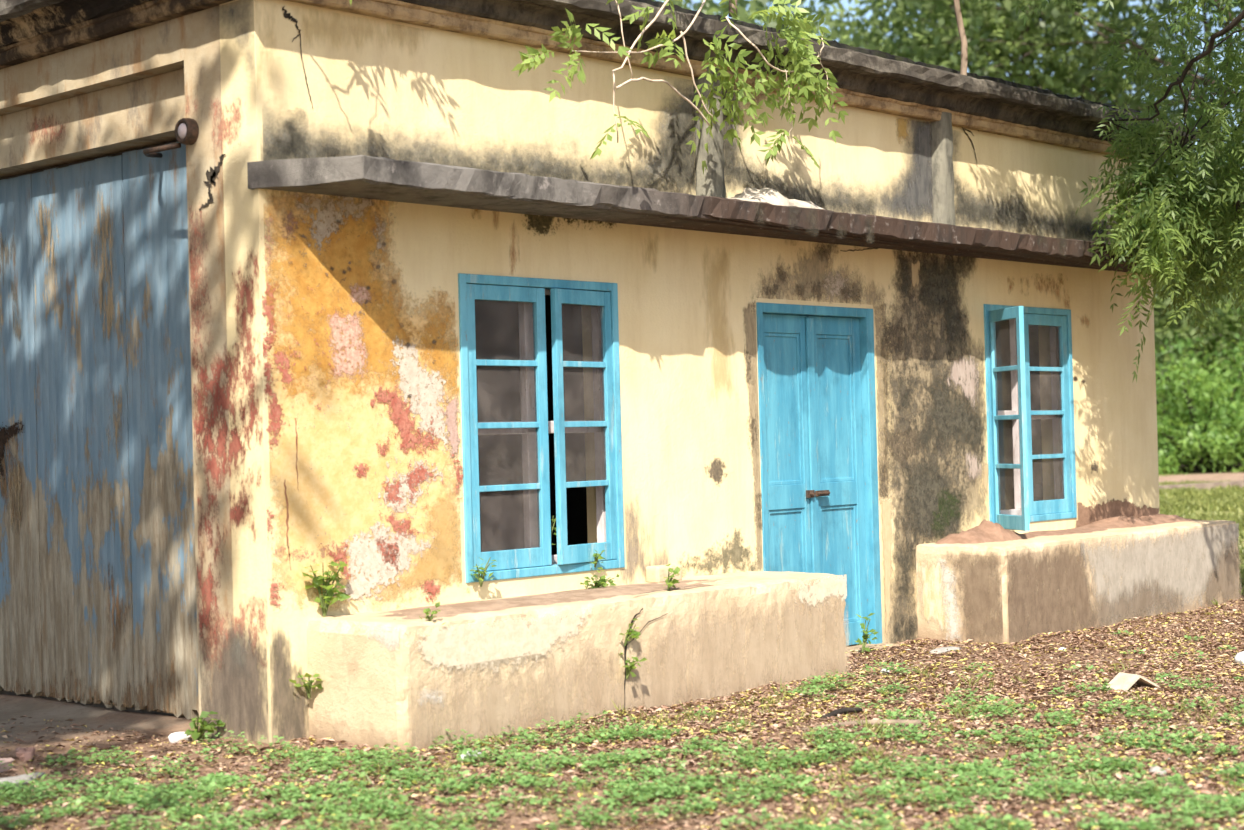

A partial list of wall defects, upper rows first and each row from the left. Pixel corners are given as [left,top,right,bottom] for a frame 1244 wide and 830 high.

crack [282,6,313,108]
corrosion [0,234,21,341]
corrosion [33,198,55,266]
corrosion [91,185,121,340]
damp [263,88,697,192]
damp [722,88,933,241]
damp [955,180,1117,245]
peeling [189,191,464,667]
damp [758,245,1178,643]
corrosion [6,654,182,714]
peeling [416,608,593,677]
peeling [795,574,847,607]